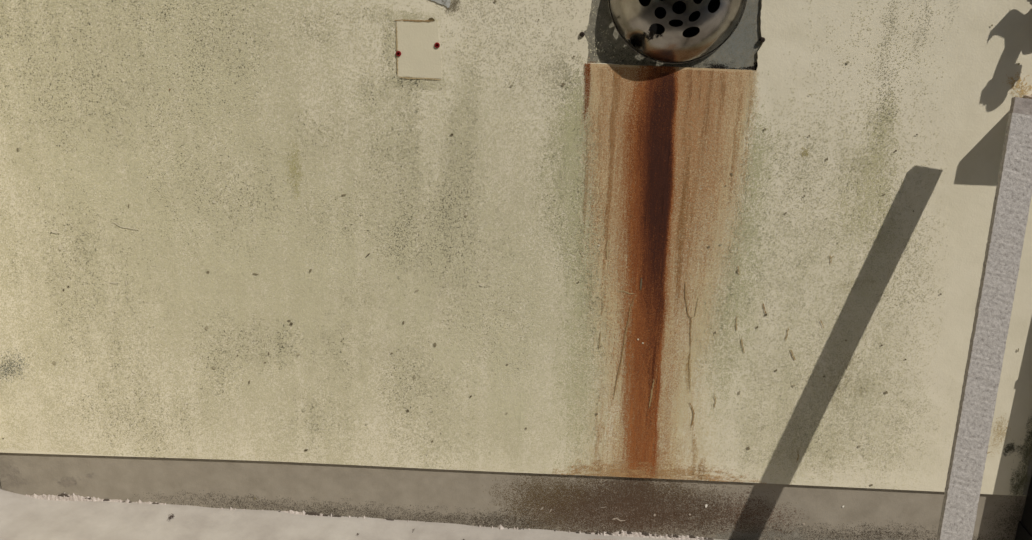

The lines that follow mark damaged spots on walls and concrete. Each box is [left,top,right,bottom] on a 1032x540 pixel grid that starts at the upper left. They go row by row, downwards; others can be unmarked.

rust [483,57,778,540]
water stain [1010,416,1032,496]